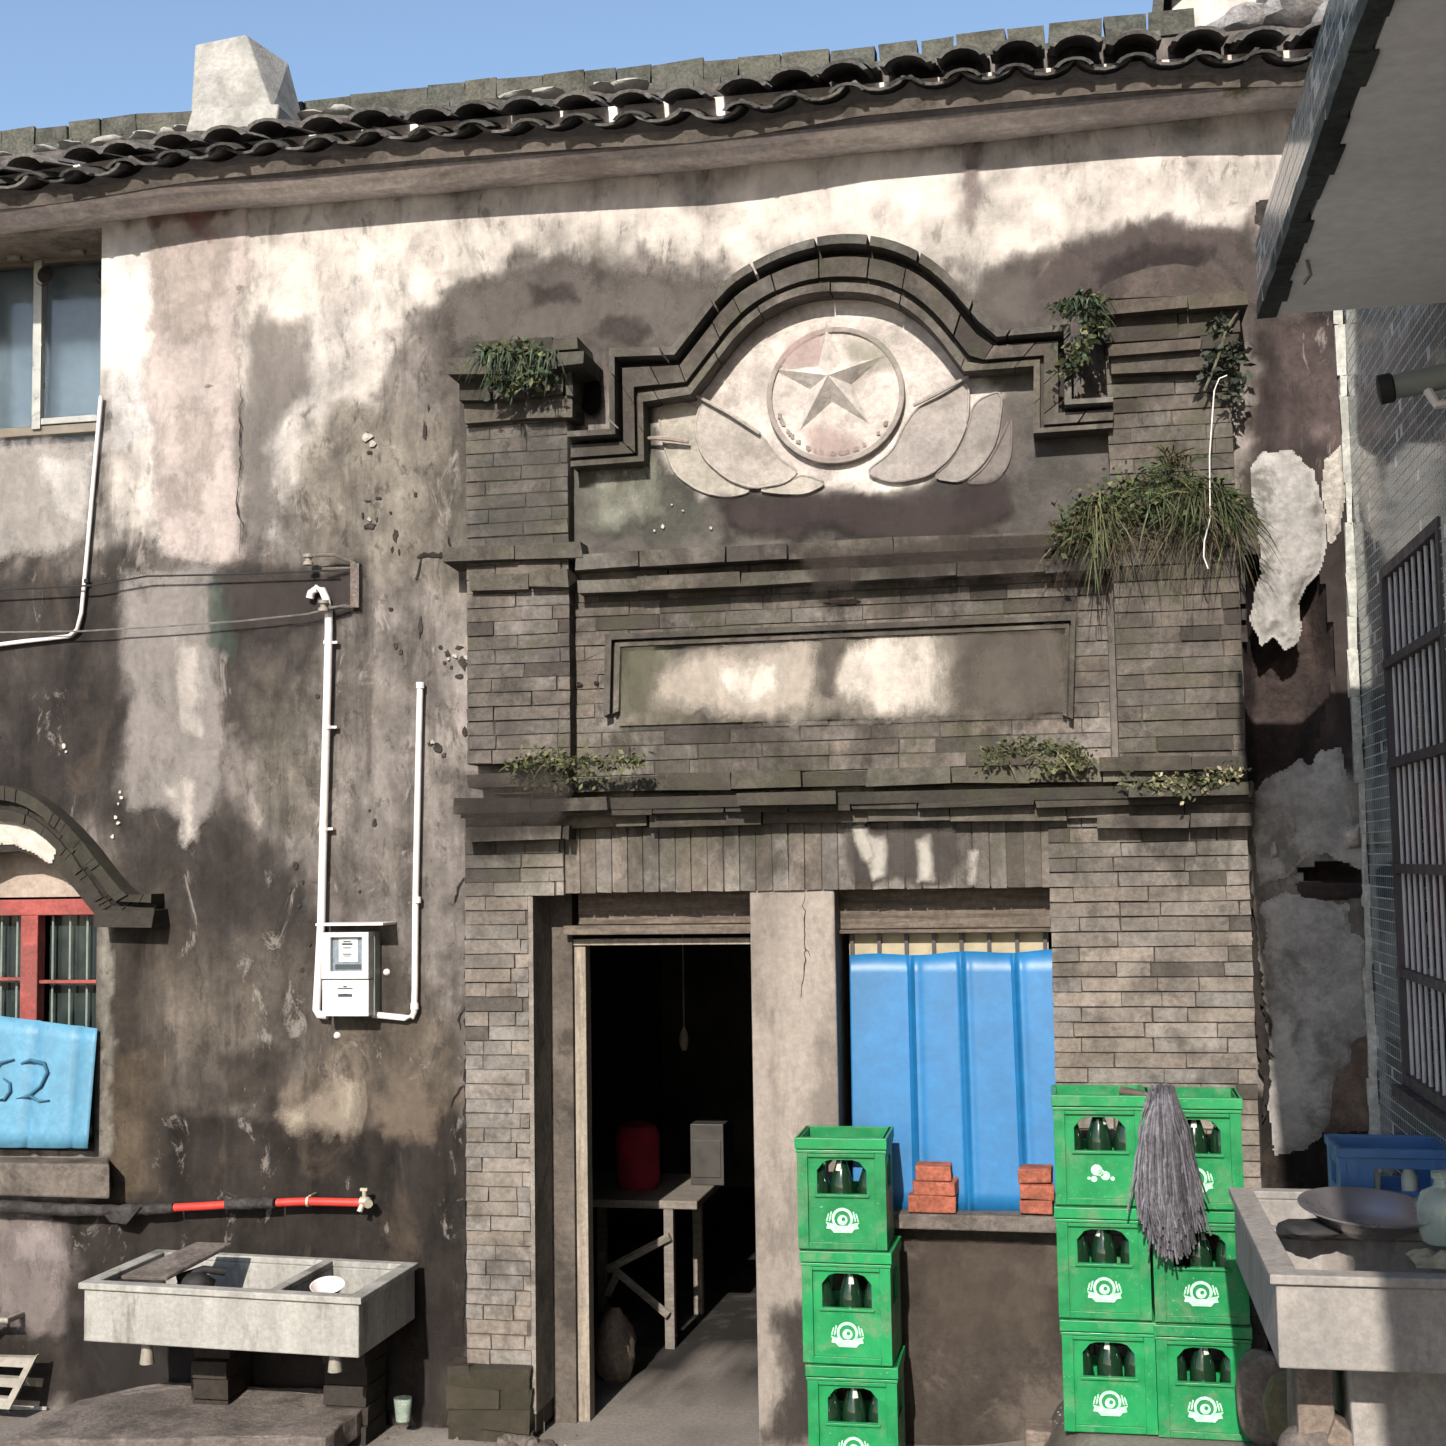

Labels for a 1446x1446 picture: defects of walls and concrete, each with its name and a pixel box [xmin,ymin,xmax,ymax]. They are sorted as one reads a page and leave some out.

water stain [120,208,351,845]
water stain [647,622,1071,723]
flaking render [1240,554,1375,1156]
water stain [280,1081,366,1135]
water stain [385,1086,437,1140]
water stain [0,1214,66,1335]
water stain [75,1326,198,1400]
water stain [251,1351,325,1389]
water stain [385,1305,468,1428]